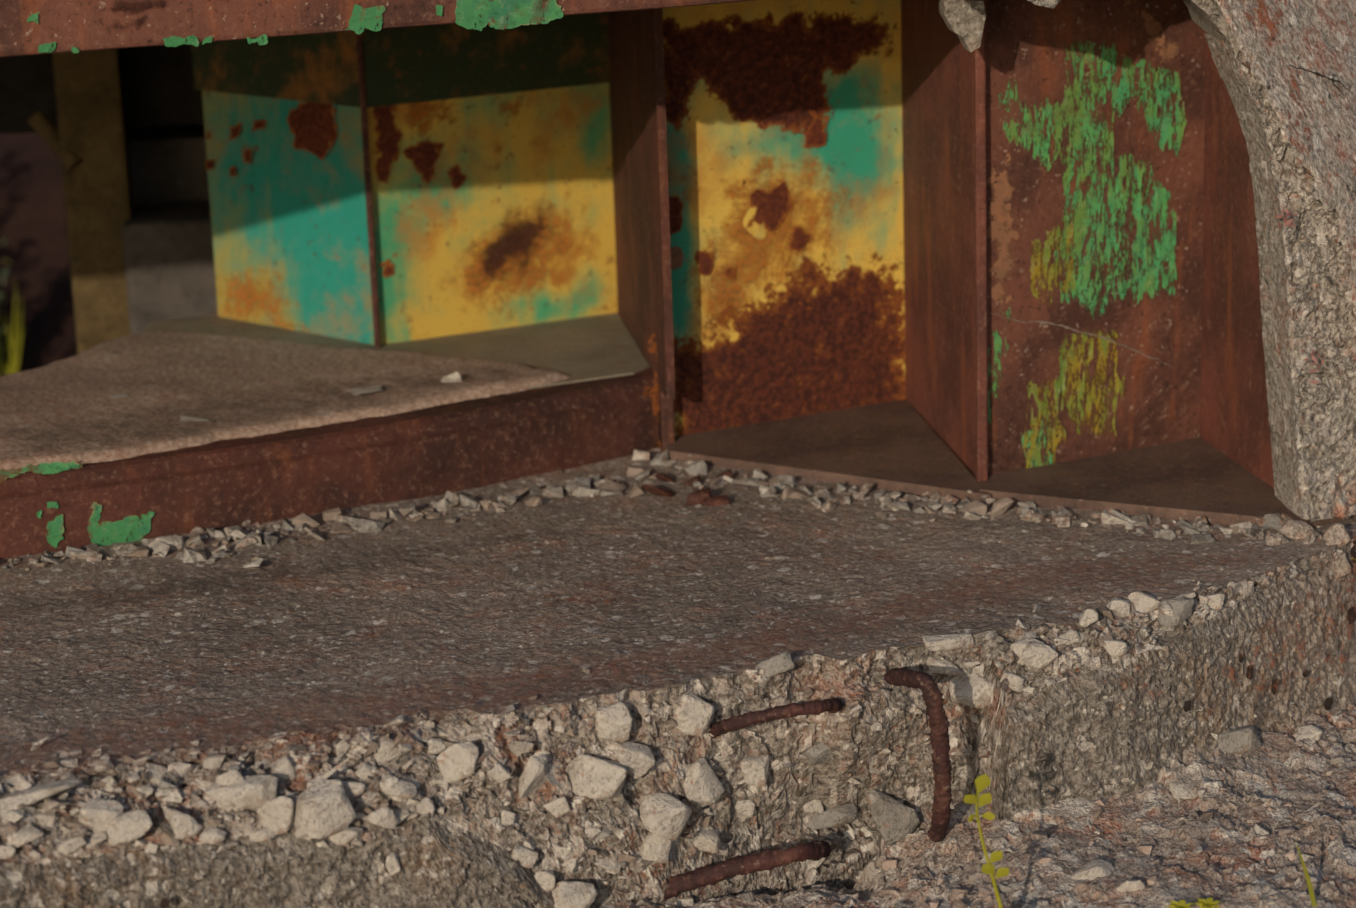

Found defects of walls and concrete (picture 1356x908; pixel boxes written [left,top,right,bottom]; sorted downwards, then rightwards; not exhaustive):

peeling [345,4,386,34]
peeling [436,0,563,31]
spalling [1028,0,1061,8]
rust [205,119,267,177]
rust [287,102,340,160]
rust [372,100,469,190]
rust [464,206,588,303]
rust [644,10,906,436]
peeling [998,41,1186,469]
spalling [1183,0,1356,546]
crack [1348,541,1356,564]
spalling [0,523,1356,908]